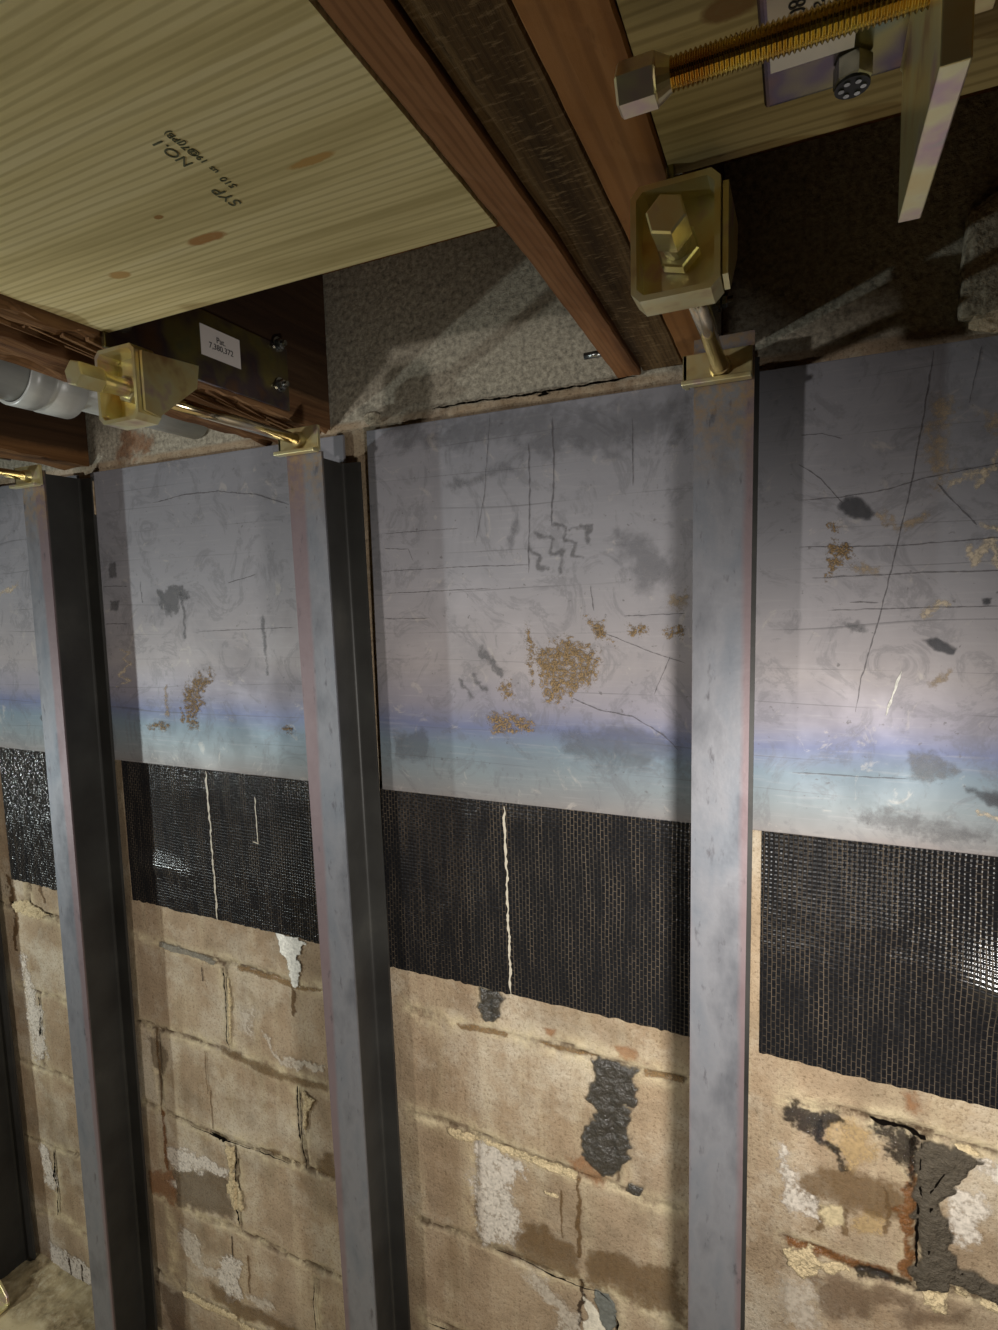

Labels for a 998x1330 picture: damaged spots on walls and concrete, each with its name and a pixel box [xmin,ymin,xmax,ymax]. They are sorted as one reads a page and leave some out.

rust [146,666,213,731]
rust [487,679,535,735]
rust [526,615,615,704]
damp [5,874,49,1065]
damp [38,1143,59,1190]
damp [151,1028,233,1217]
crack [170,1086,315,1224]
spalling [954,1143,983,1157]
damp [179,1229,294,1330]
crack [496,1249,619,1330]
spalling [782,1243,850,1280]
spalling [922,1287,998,1315]